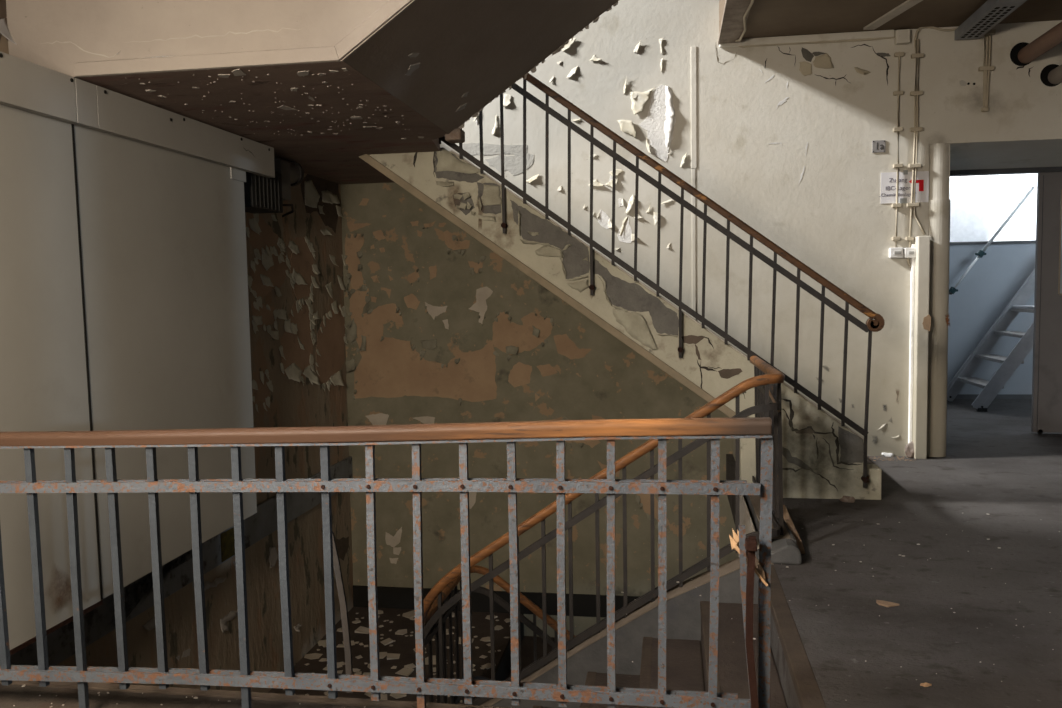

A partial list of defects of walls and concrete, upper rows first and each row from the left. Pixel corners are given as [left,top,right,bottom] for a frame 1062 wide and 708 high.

crack [765,47,850,85]
crack [851,44,890,84]
peeling [434,0,743,379]
peeling [246,174,592,411]
crack [782,399,864,470]
spalling [335,537,349,561]
peeling [385,527,402,564]